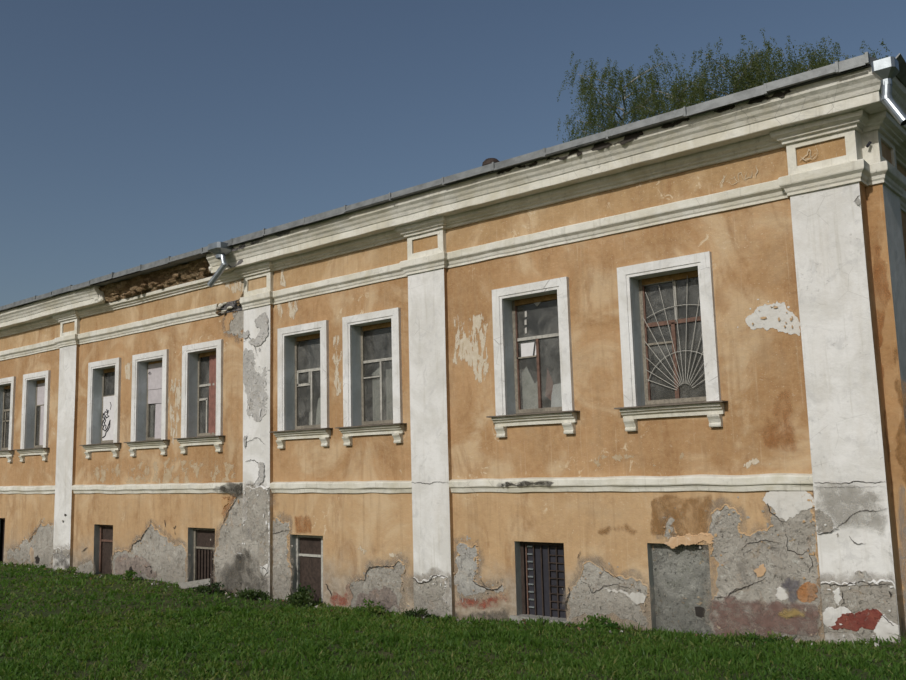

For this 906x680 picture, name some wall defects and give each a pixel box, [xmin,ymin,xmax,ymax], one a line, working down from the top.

peeling [577,131,643,156]
peeling [223,309,269,422]
peeling [277,301,298,319]
peeling [453,314,489,382]
peeling [737,299,801,336]
spalling [7,514,70,568]
spalling [76,547,94,575]
spalling [93,455,293,600]
spalling [349,536,505,618]
spalling [562,553,650,630]
spalling [662,491,900,644]